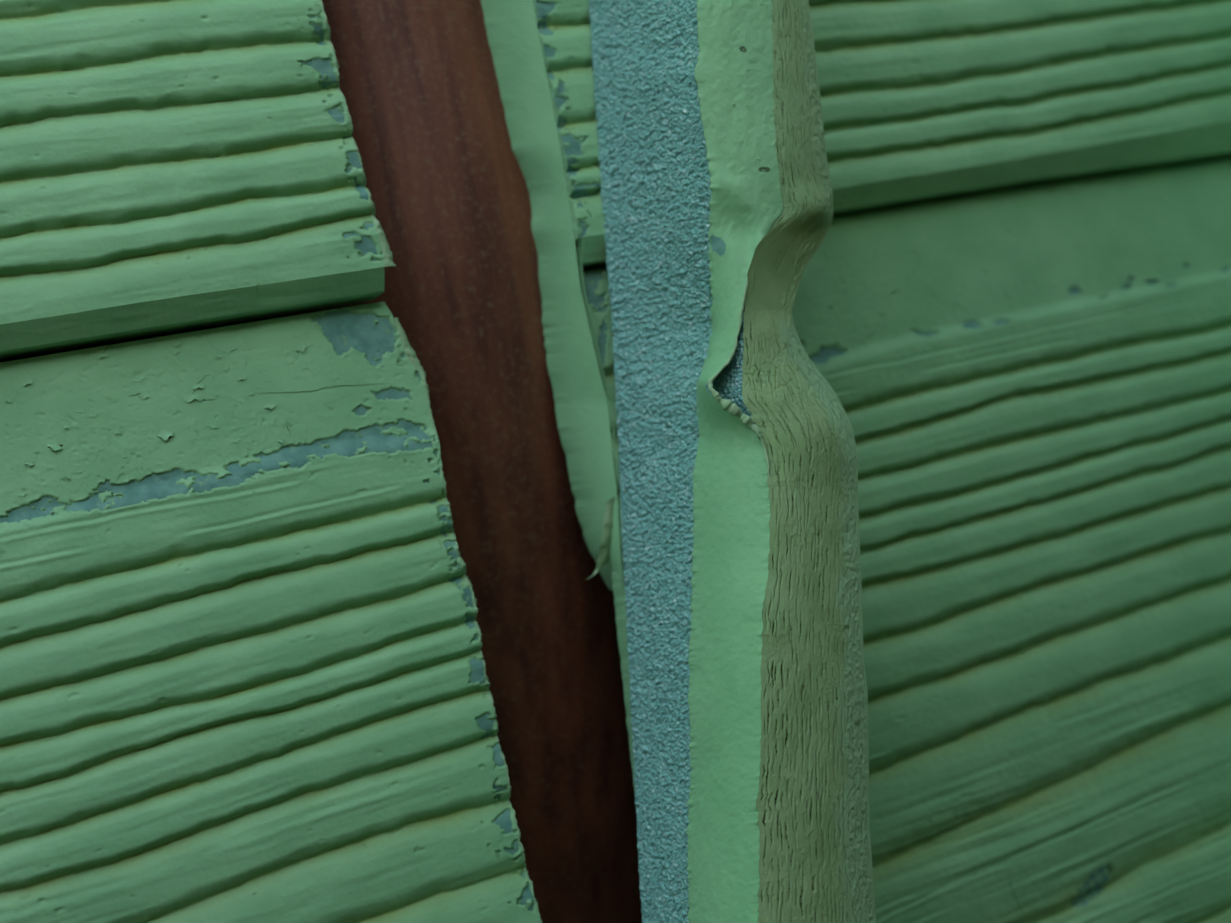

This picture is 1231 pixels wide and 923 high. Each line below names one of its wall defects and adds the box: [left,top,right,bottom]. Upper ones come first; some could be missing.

spalling [301,16,369,200]
spalling [343,222,378,261]
peeling [313,308,405,366]
peeling [0,388,440,523]
spalling [429,500,478,641]
spalling [475,713,535,911]